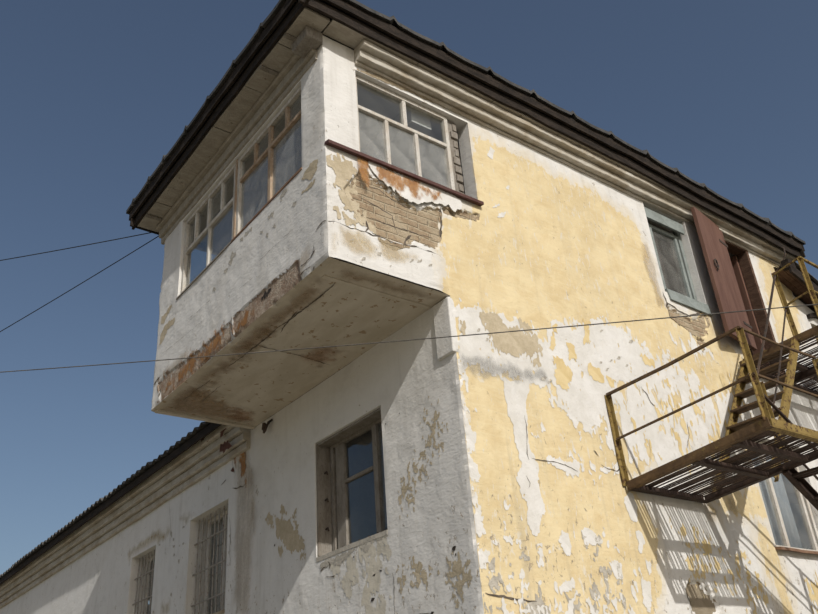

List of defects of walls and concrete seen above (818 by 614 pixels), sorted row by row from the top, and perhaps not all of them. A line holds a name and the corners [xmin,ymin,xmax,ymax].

flaking render [292,152,480,256]
spalling [157,260,302,400]
peeling [320,298,773,614]
peeling [265,504,306,560]